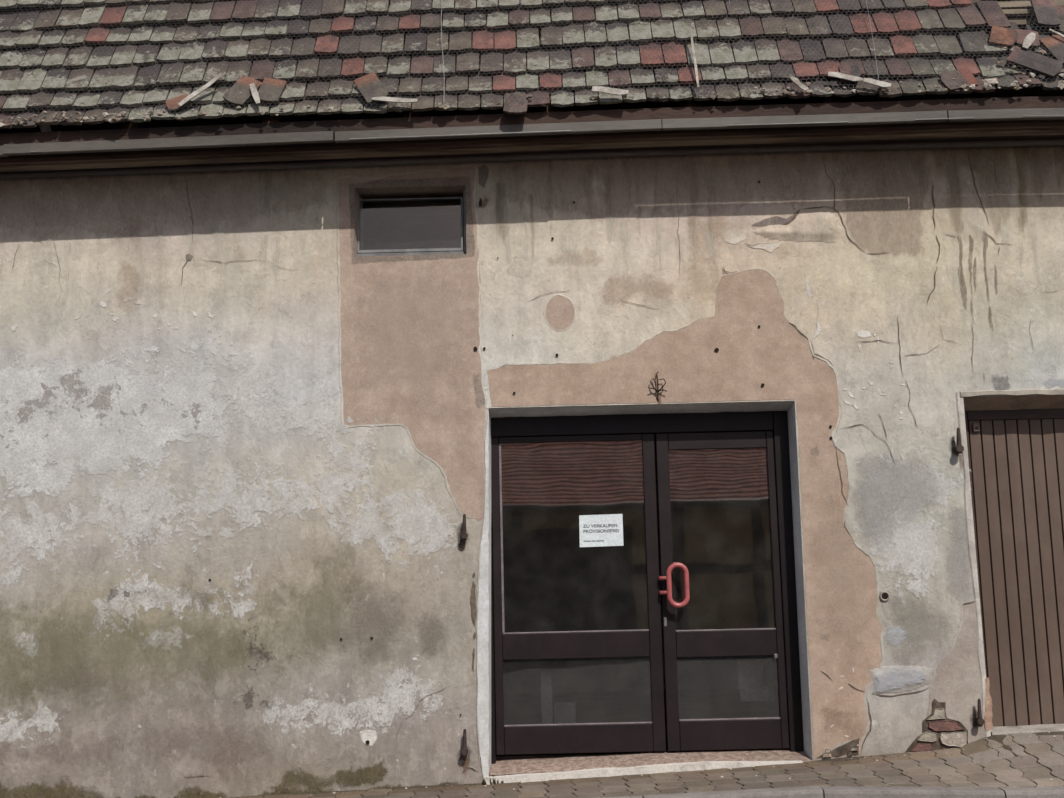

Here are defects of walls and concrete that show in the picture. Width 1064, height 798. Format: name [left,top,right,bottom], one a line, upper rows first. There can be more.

crack [805,155,887,254]
crack [968,151,1012,254]
crack [790,323,833,366]
crack [856,181,985,426]
peeling [0,165,971,759]
crack [836,413,896,536]
peeling [905,601,993,753]